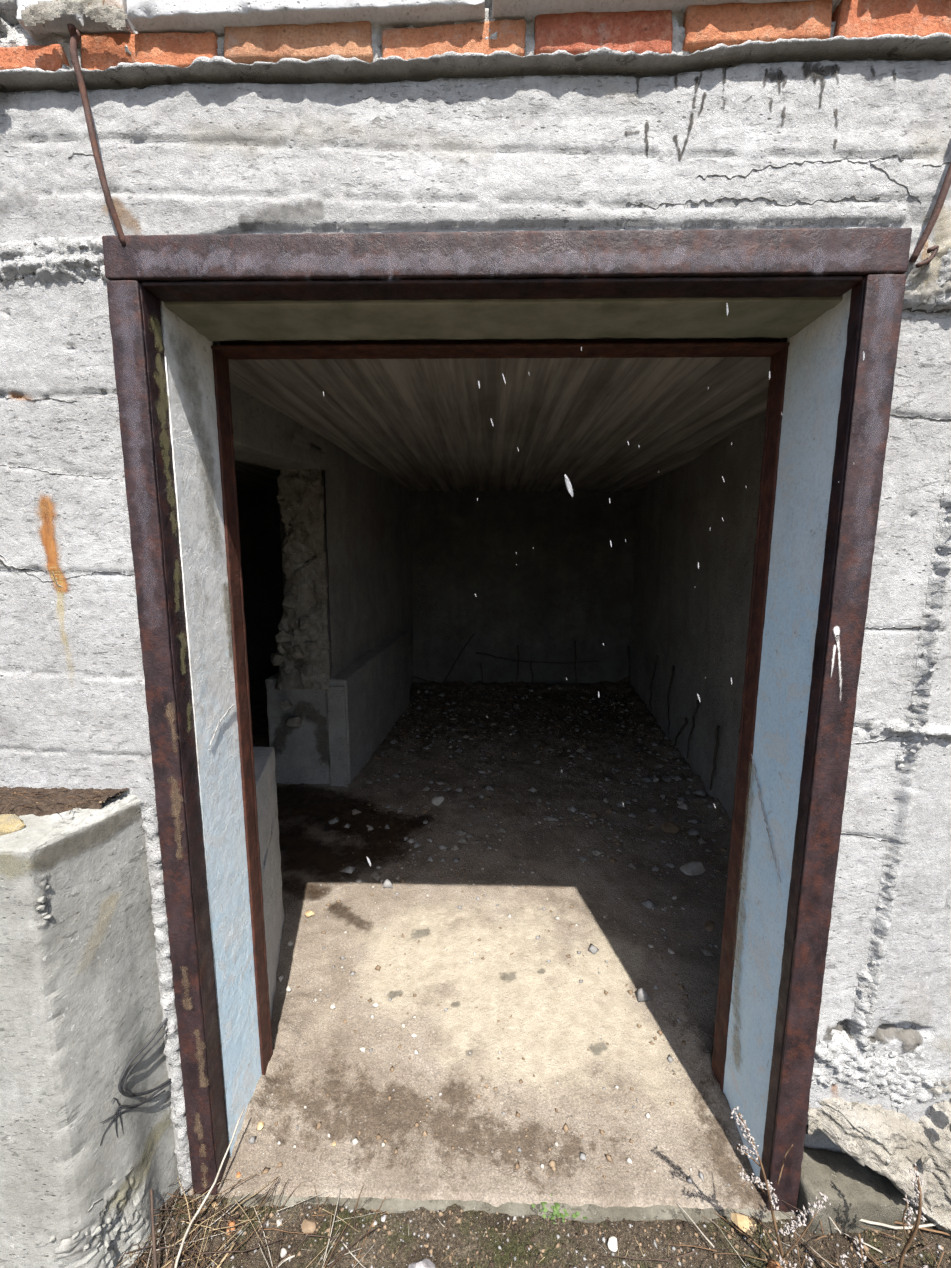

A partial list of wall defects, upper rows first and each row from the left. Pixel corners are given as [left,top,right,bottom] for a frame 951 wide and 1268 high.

water stain [625,122,649,158]
water stain [662,63,748,160]
water stain [763,67,787,125]
crack [629,155,950,210]
water stain [799,59,876,148]
corrosion [40,497,67,592]
crack [0,553,127,587]
water stain [277,784,433,926]
spalling [812,1020,951,1117]